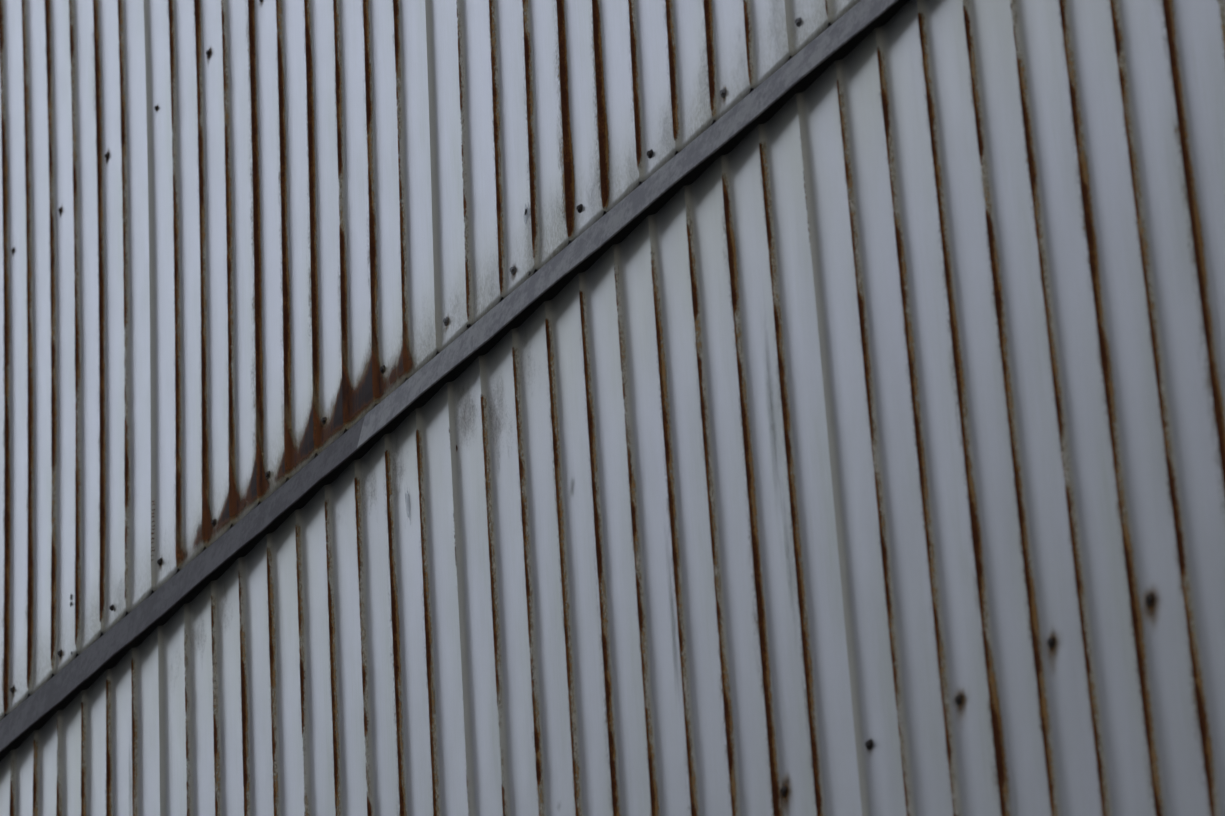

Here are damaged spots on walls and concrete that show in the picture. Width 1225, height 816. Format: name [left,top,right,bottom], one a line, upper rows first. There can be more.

corrosion [160,0,412,568]
corrosion [385,450,407,816]
corrosion [579,290,620,816]
corrosion [650,252,698,816]
corrosion [686,219,737,816]
corrosion [722,175,789,816]
corrosion [759,143,823,816]
corrosion [877,47,964,816]
corrosion [918,13,1010,816]
corrosion [963,5,1058,816]
corrosion [1059,0,1162,816]
corrosion [1110,0,1225,816]